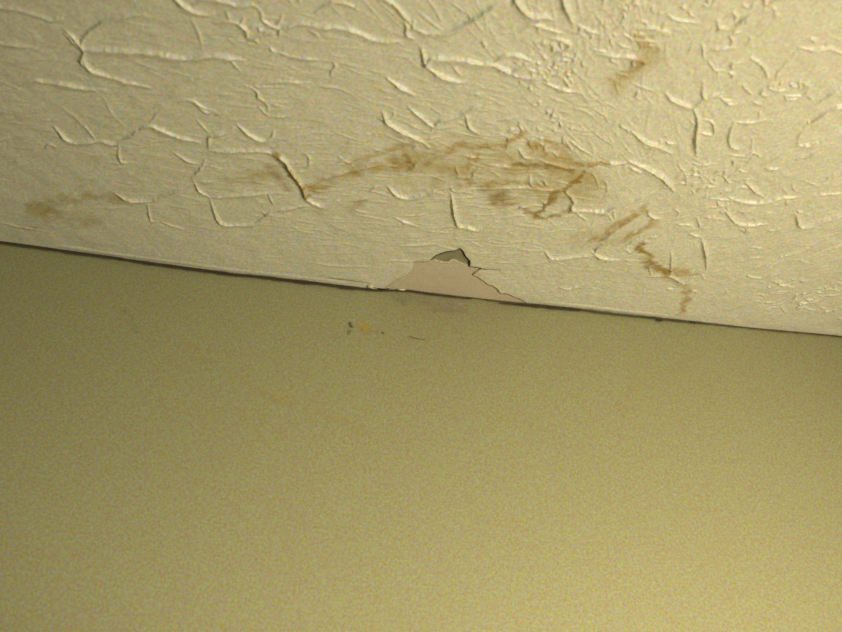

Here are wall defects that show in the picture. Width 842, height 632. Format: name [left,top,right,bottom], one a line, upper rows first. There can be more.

water stain [274,153,326,200]
water stain [534,164,598,219]
peeling [367,248,526,303]